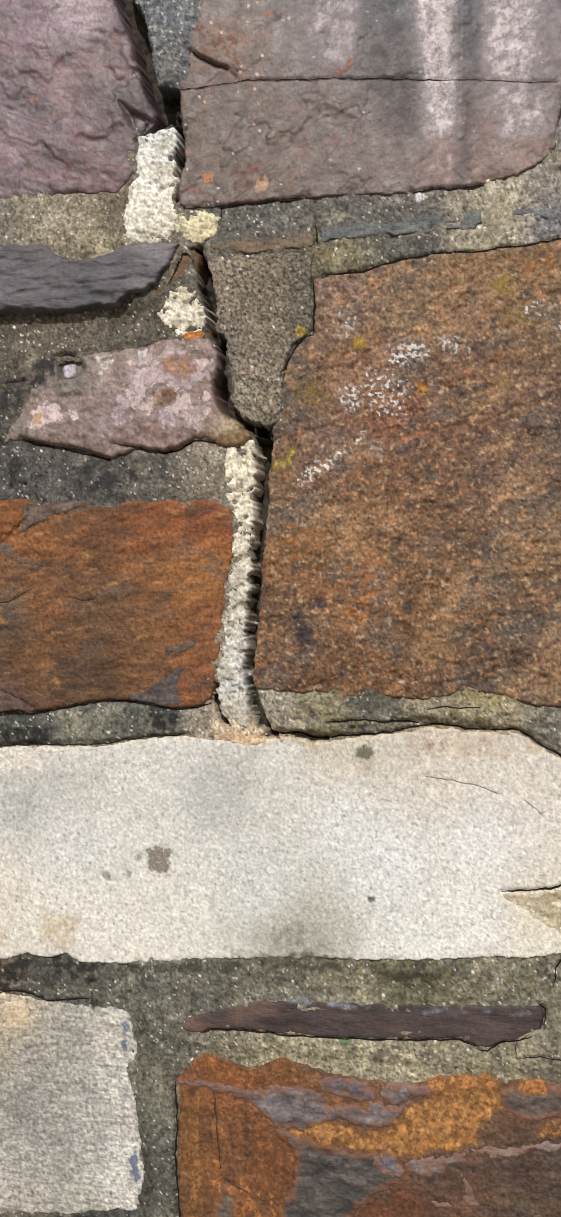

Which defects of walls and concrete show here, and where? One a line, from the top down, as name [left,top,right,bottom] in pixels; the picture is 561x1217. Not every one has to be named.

leakage [306,0,361,63]
crack [125,0,561,168]
leakage [412,0,467,184]
leakage [483,0,561,139]
crack [176,197,318,245]
crack [412,185,481,194]
crack [0,439,215,461]
crack [196,238,561,757]
crack [0,694,230,747]
crack [501,884,561,892]
crack [0,990,90,1002]
crack [206,959,561,1061]